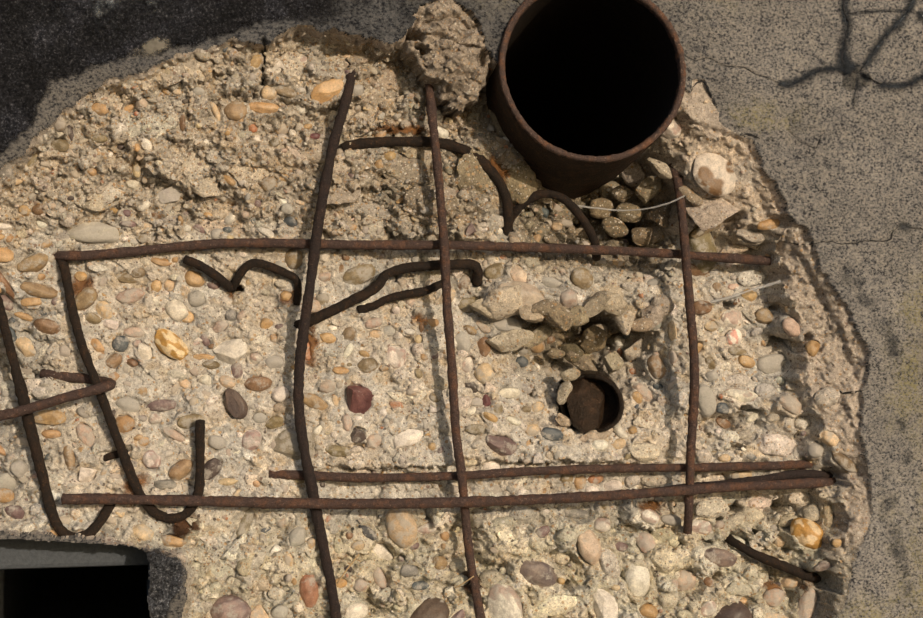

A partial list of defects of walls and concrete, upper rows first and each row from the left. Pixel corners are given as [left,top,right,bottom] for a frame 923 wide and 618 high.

crack [684,0,923,108]
damp [0,0,344,153]
rust [375,124,430,135]
crack [785,227,922,245]
rust [72,277,94,295]
spalling [0,20,439,618]
rust [306,326,319,367]
spalling [303,58,873,618]
rust [639,500,661,512]
rust [172,513,201,538]
rust [462,570,483,594]